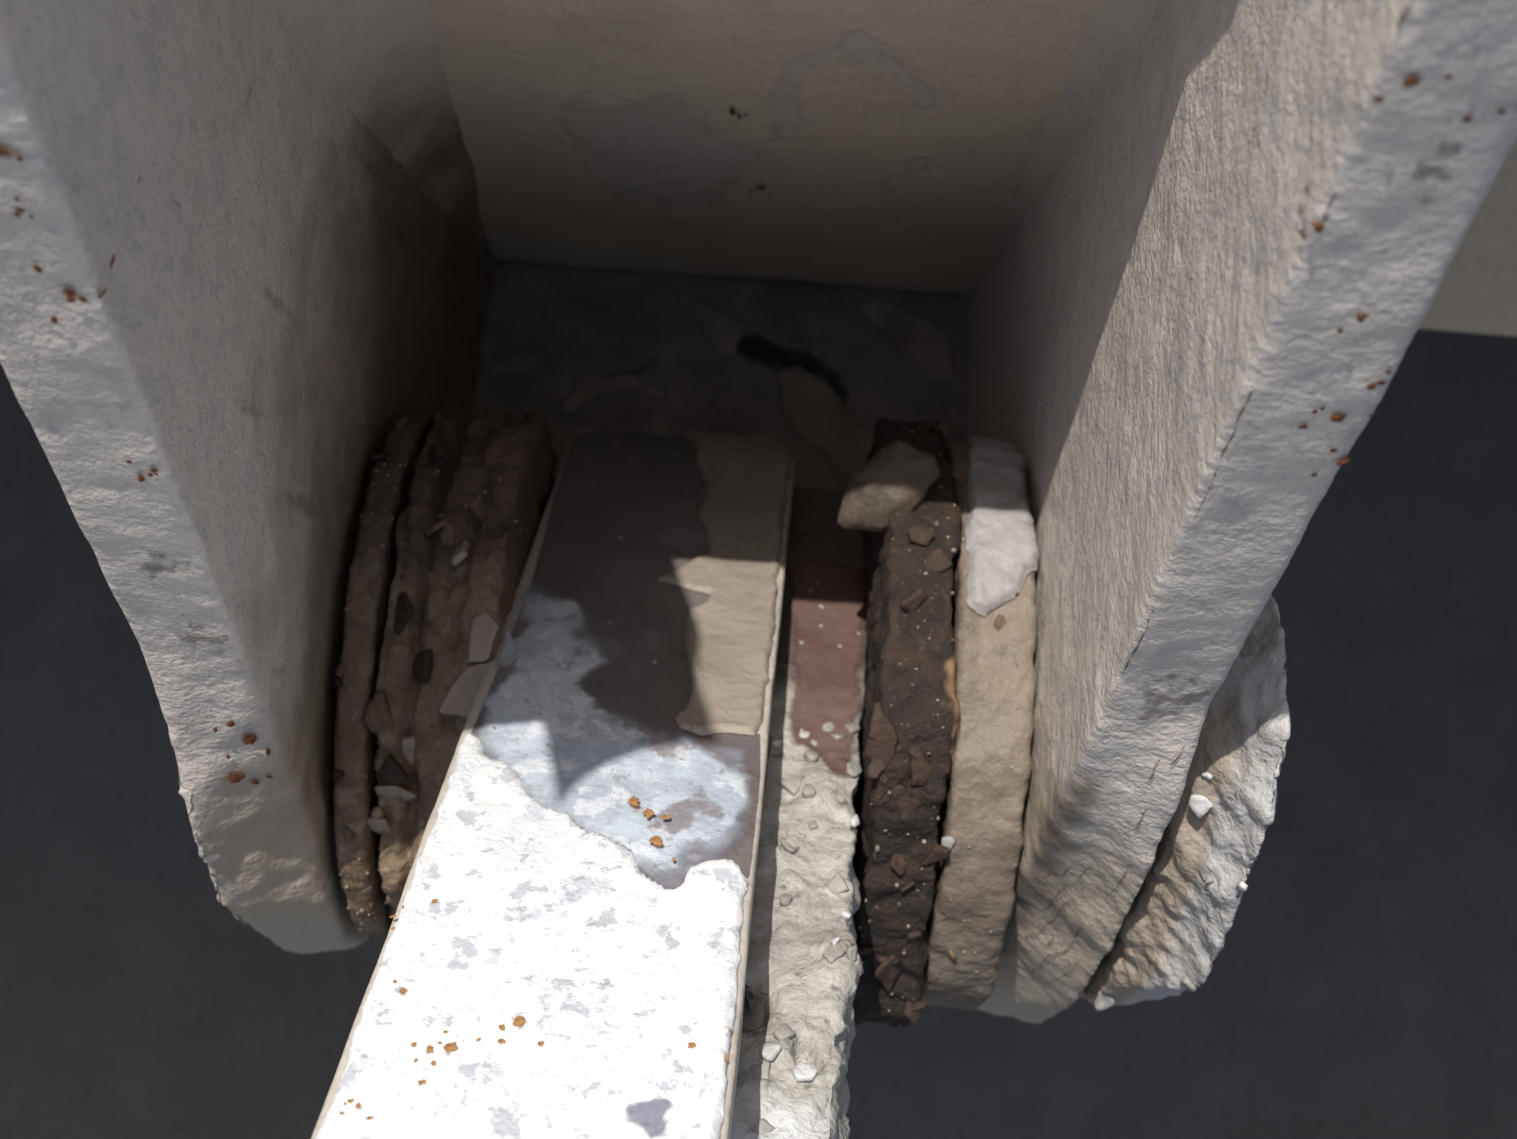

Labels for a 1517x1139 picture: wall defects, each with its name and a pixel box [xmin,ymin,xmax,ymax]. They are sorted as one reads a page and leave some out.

corrosion [1403,76,1419,87]
corrosion [1299,186,1325,240]
corrosion [64,287,106,303]
corrosion [1298,406,1347,429]
corrosion [126,460,158,482]
peeling [440,431,760,890]
corrosion [945,654,960,740]
corrosion [213,720,271,756]
corrosion [223,755,273,785]
crack [1003,745,1185,987]
corrosion [476,1016,525,1044]
corrosion [411,1030,458,1086]